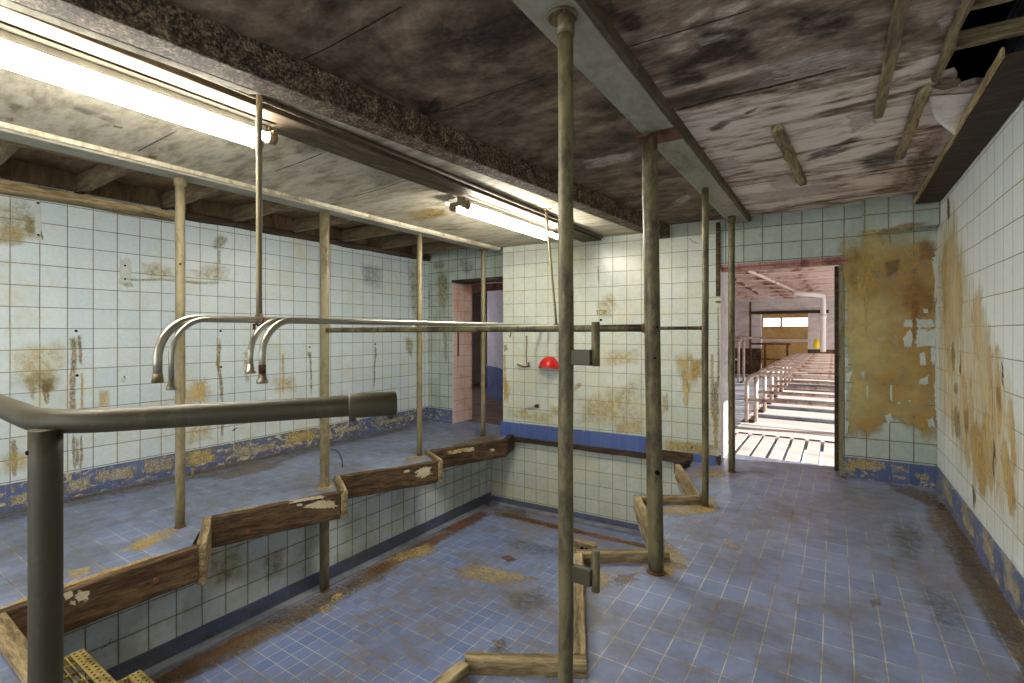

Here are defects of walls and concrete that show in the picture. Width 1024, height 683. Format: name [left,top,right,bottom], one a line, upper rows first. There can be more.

water stain [669,30,752,84]
water stain [809,138,856,160]
water stain [860,133,939,191]
rust [69,330,83,409]
peeling [844,357,868,401]
peeling [903,247,937,428]
peeling [64,429,320,494]
spalling [64,449,558,683]
spalling [574,512,640,531]
peeling [943,478,1022,606]